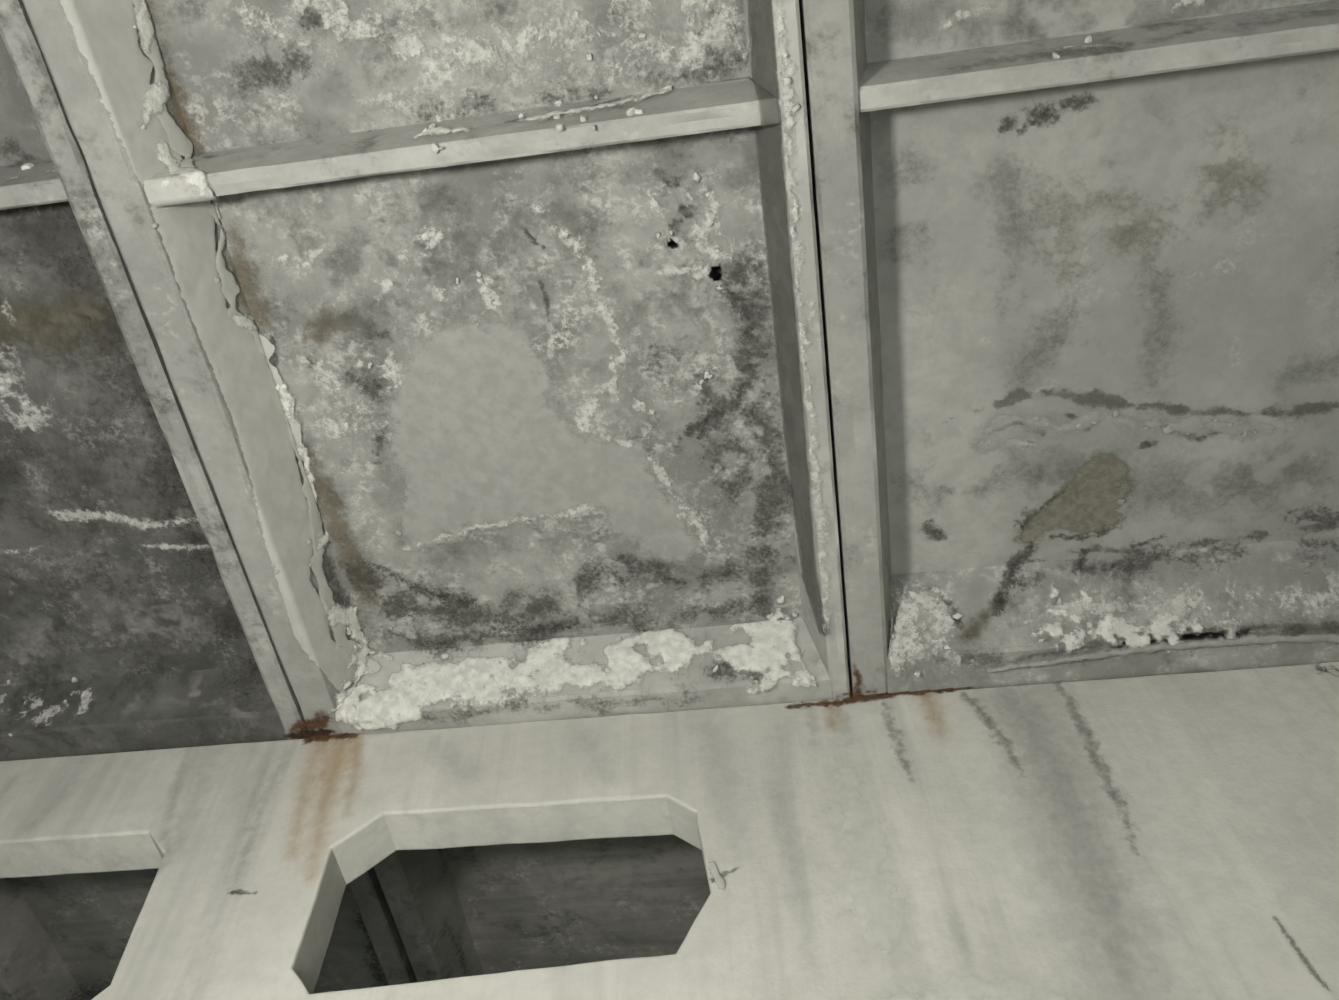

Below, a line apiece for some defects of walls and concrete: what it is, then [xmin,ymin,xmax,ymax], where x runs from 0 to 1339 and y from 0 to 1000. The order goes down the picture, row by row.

damp [133,0,154,53]
damp [234,0,384,92]
damp [138,74,210,197]
damp [999,95,1094,133]
damp [232,234,277,366]
damp [0,247,220,586]
damp [276,384,294,420]
damp [296,0,831,731]
damp [888,579,1002,677]
damp [998,546,1339,653]
rust [284,714,357,744]
rust [785,665,973,709]